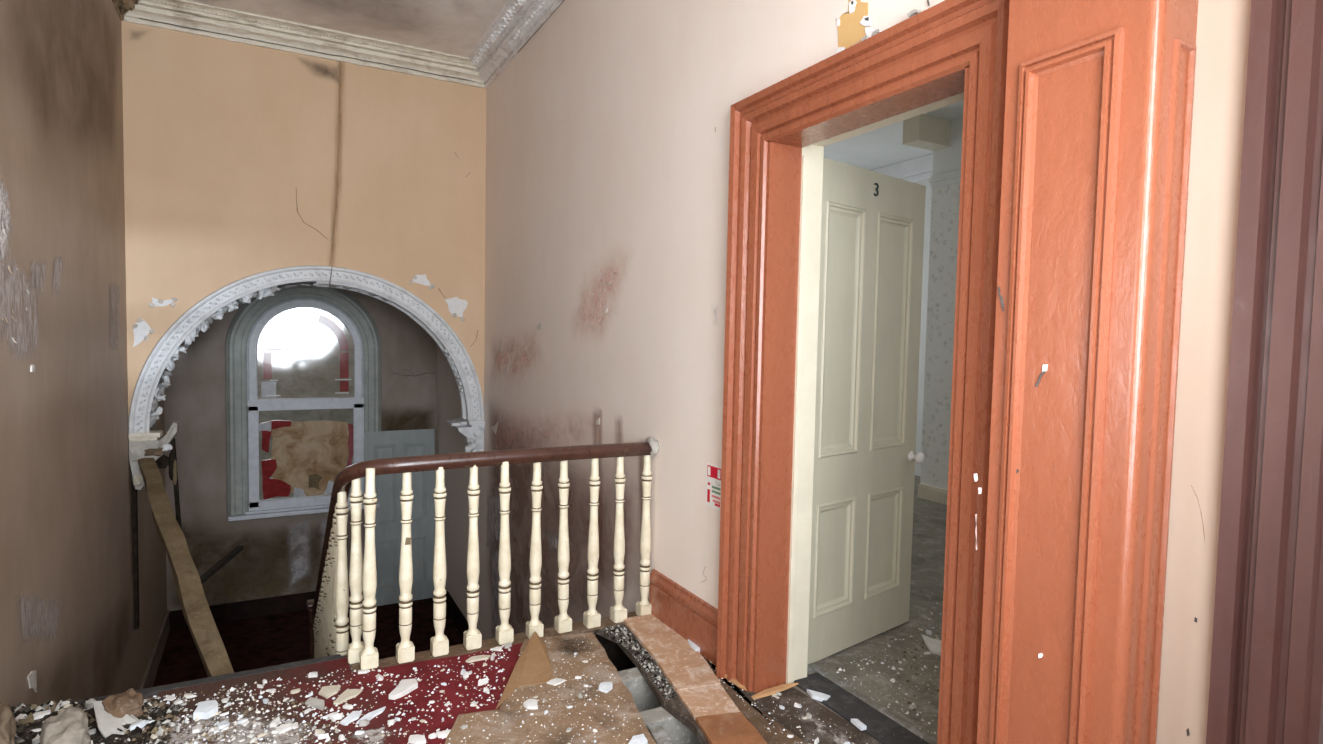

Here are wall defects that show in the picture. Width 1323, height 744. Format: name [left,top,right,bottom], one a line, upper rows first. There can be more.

crack [139,18,476,290]
peeling [0,182,39,372]
peeling [409,274,468,321]